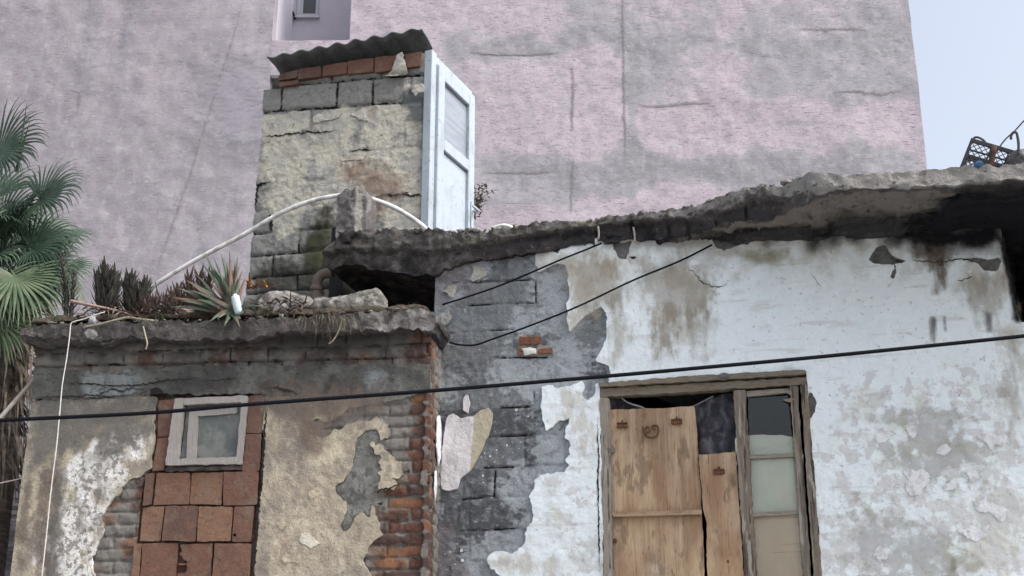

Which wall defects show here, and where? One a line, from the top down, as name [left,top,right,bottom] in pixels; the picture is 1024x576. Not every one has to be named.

flaking render [712,239,742,251]
flaking render [869,245,904,279]
crack [891,257,977,281]
crack [38,377,236,398]
flaking render [312,251,611,576]
flaking render [93,470,151,576]